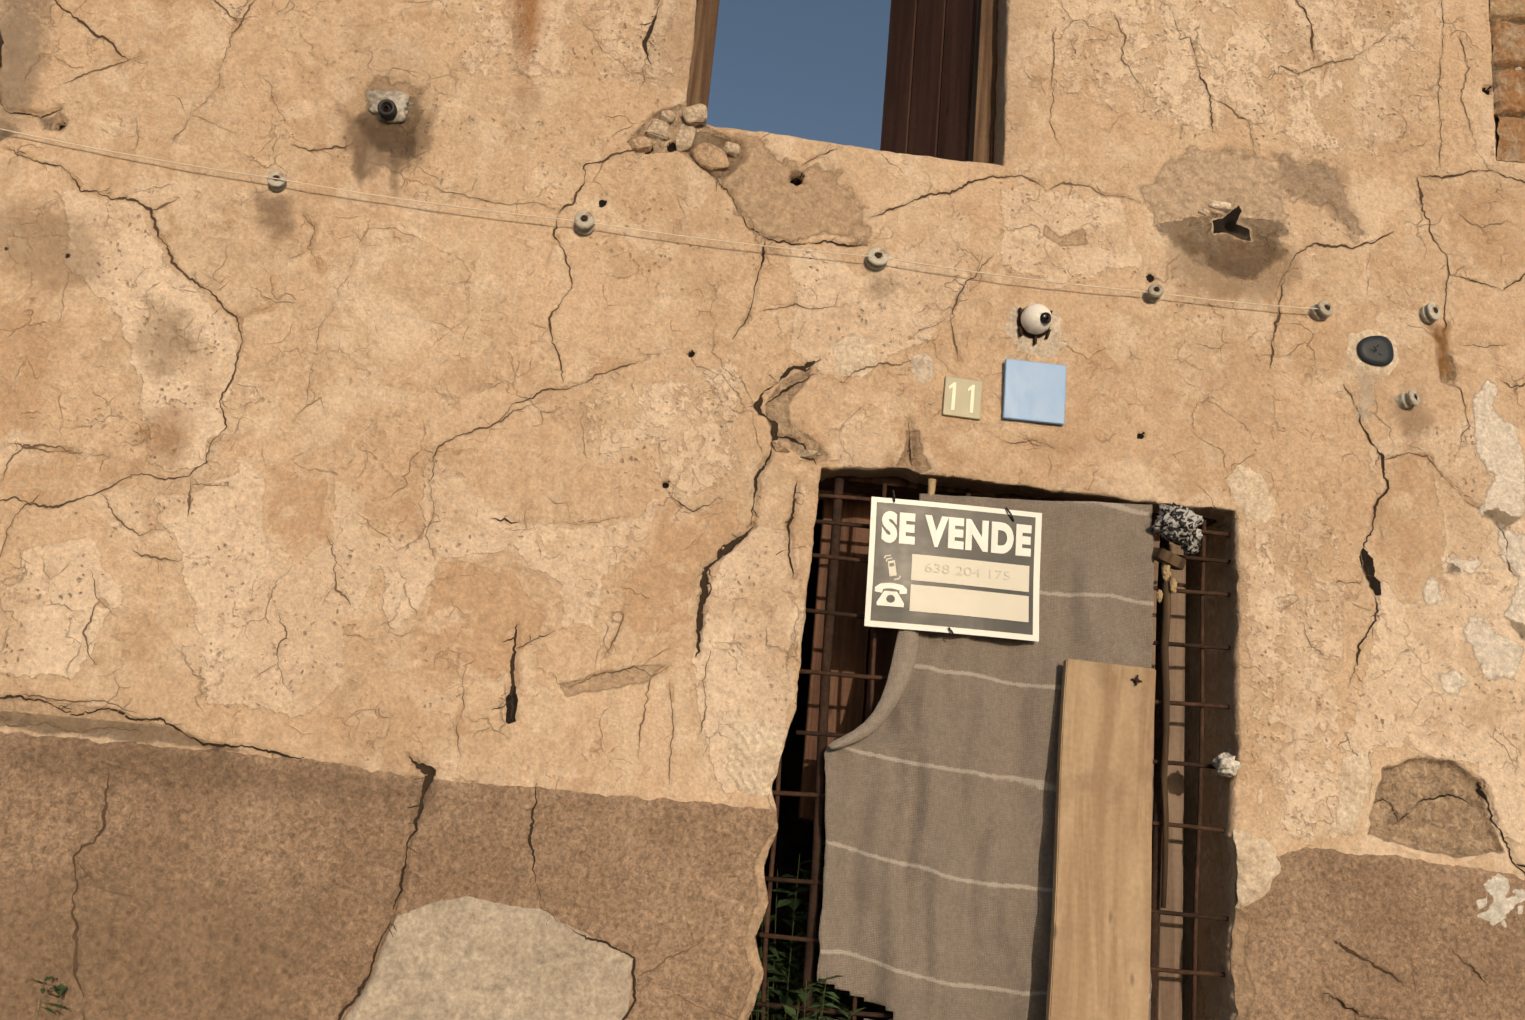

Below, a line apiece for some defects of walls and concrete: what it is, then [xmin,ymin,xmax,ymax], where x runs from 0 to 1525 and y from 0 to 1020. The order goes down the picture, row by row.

crack [0,0,139,118]
spalling [627,103,871,246]
crack [691,30,1141,338]
crack [0,151,277,574]
crack [425,150,639,558]
crack [1270,0,1525,687]
crack [0,569,304,759]
crack [338,625,554,1020]
crack [572,256,993,784]
spalling [1334,753,1505,858]
peeling [1422,577,1443,605]
peeling [1439,380,1525,694]